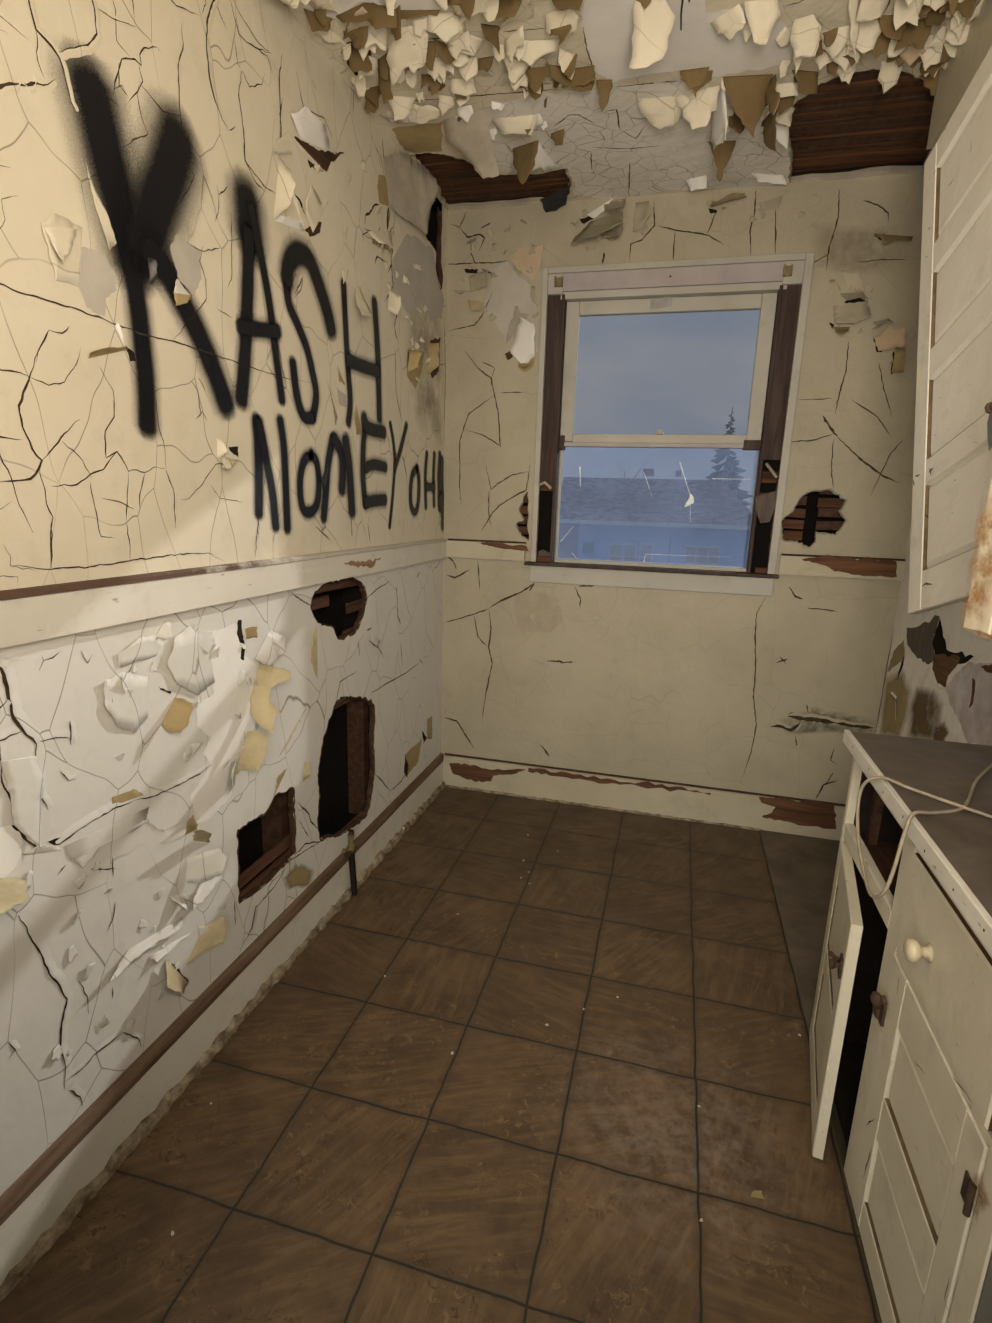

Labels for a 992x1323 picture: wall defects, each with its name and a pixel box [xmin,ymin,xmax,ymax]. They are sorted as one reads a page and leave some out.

peeling [273,0,983,389]
crack [362,203,402,421]
crack [793,341,933,518]
flaking render [310,558,381,679]
crack [740,587,838,784]
flaking render [767,488,897,578]
crack [876,628,897,730]
flaking render [887,615,992,746]
rust [965,514,992,610]
peeling [0,620,375,1000]
peeling [759,797,836,829]
crack [816,750,838,798]